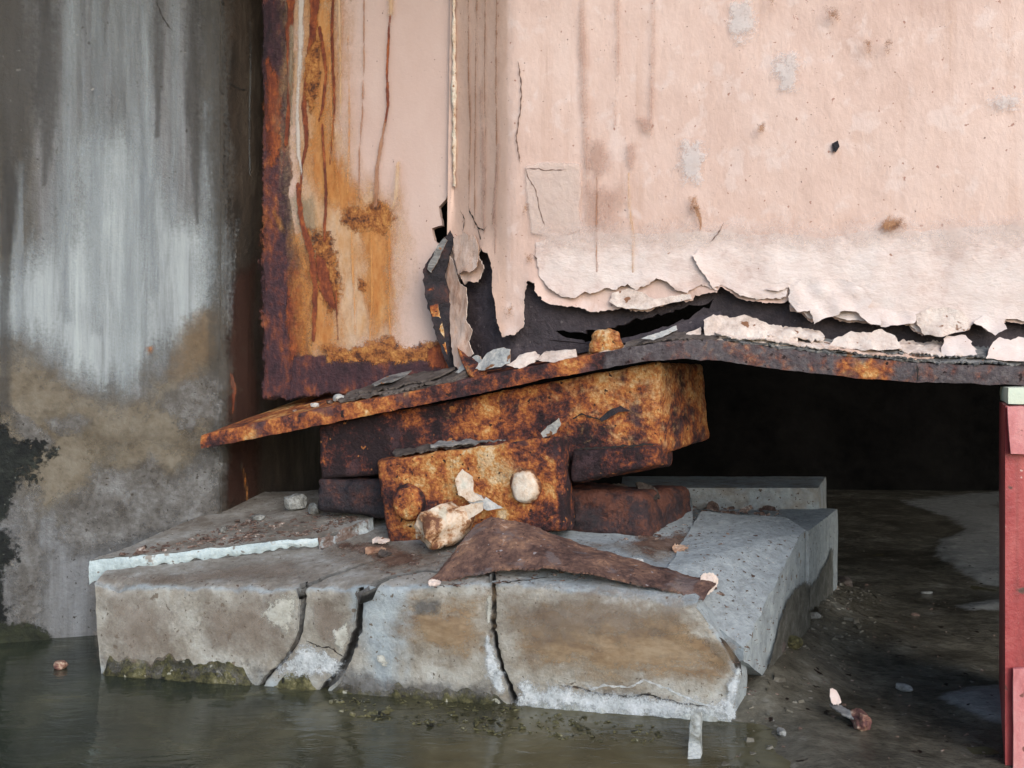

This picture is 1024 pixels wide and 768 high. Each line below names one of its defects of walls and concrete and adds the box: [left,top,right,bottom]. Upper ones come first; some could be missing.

damp [0,0,231,517]
rust [224,0,487,426]
peeling [447,232,577,373]
peeling [535,224,1024,361]
rust [621,310,1024,366]
rust [225,438,258,505]
rust [393,439,505,457]
rust [573,406,630,422]
damp [207,596,279,650]
crack [258,559,438,689]
crack [486,573,545,703]